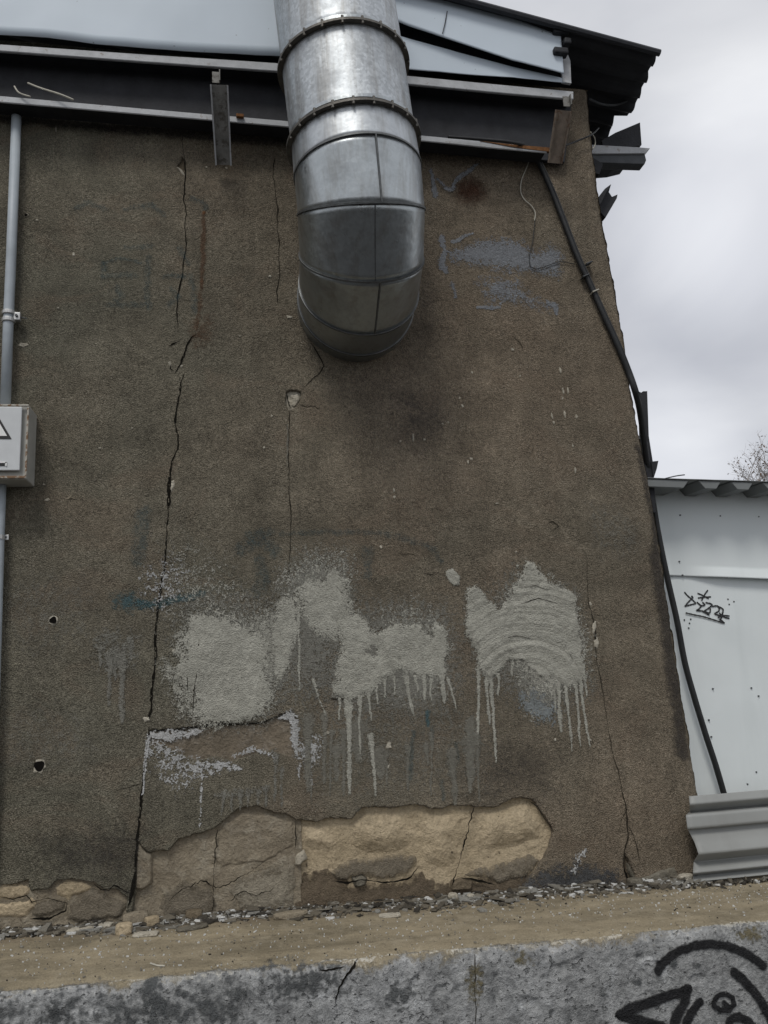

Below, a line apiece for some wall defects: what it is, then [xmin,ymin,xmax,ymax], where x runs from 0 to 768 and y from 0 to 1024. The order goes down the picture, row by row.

crack [272,159,280,303]
crack [117,137,197,905]
flaking render [285,392,319,410]
crack [286,346,329,593]
damp [199,748,284,828]
crack [587,580,640,883]
flaking render [0,797,551,932]
crack [321,958,358,1005]